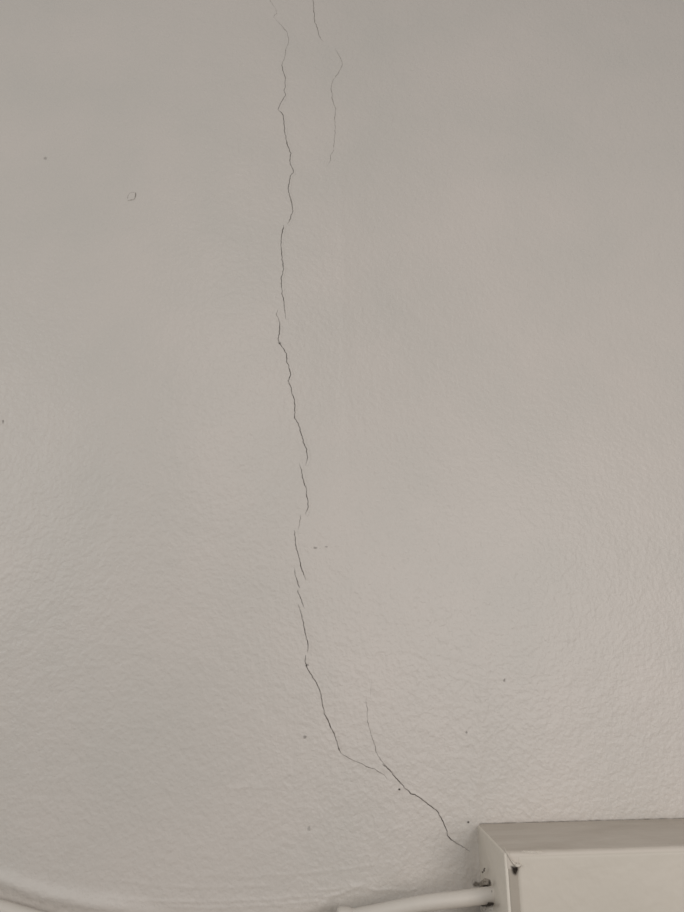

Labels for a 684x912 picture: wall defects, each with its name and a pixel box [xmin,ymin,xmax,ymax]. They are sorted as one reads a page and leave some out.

crack [276,50,471,851]